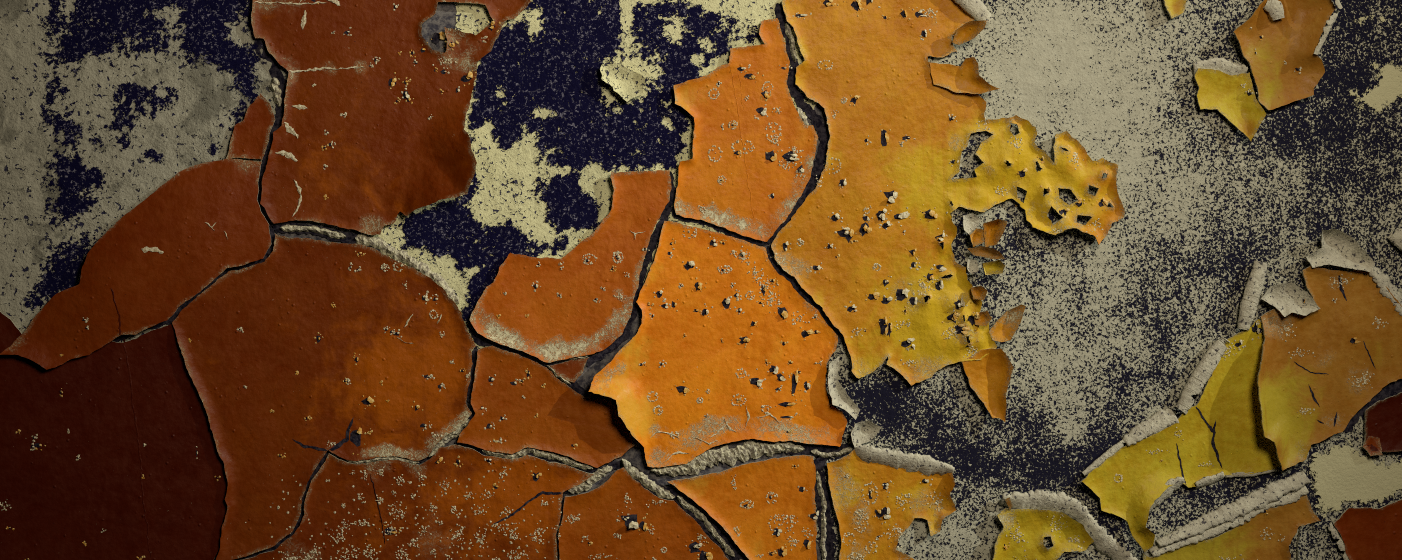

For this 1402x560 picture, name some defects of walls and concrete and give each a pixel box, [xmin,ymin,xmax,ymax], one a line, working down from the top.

peeling [0,0,289,370]
crack [113,3,854,560]
peeling [370,0,817,351]
peeling [808,0,1402,560]